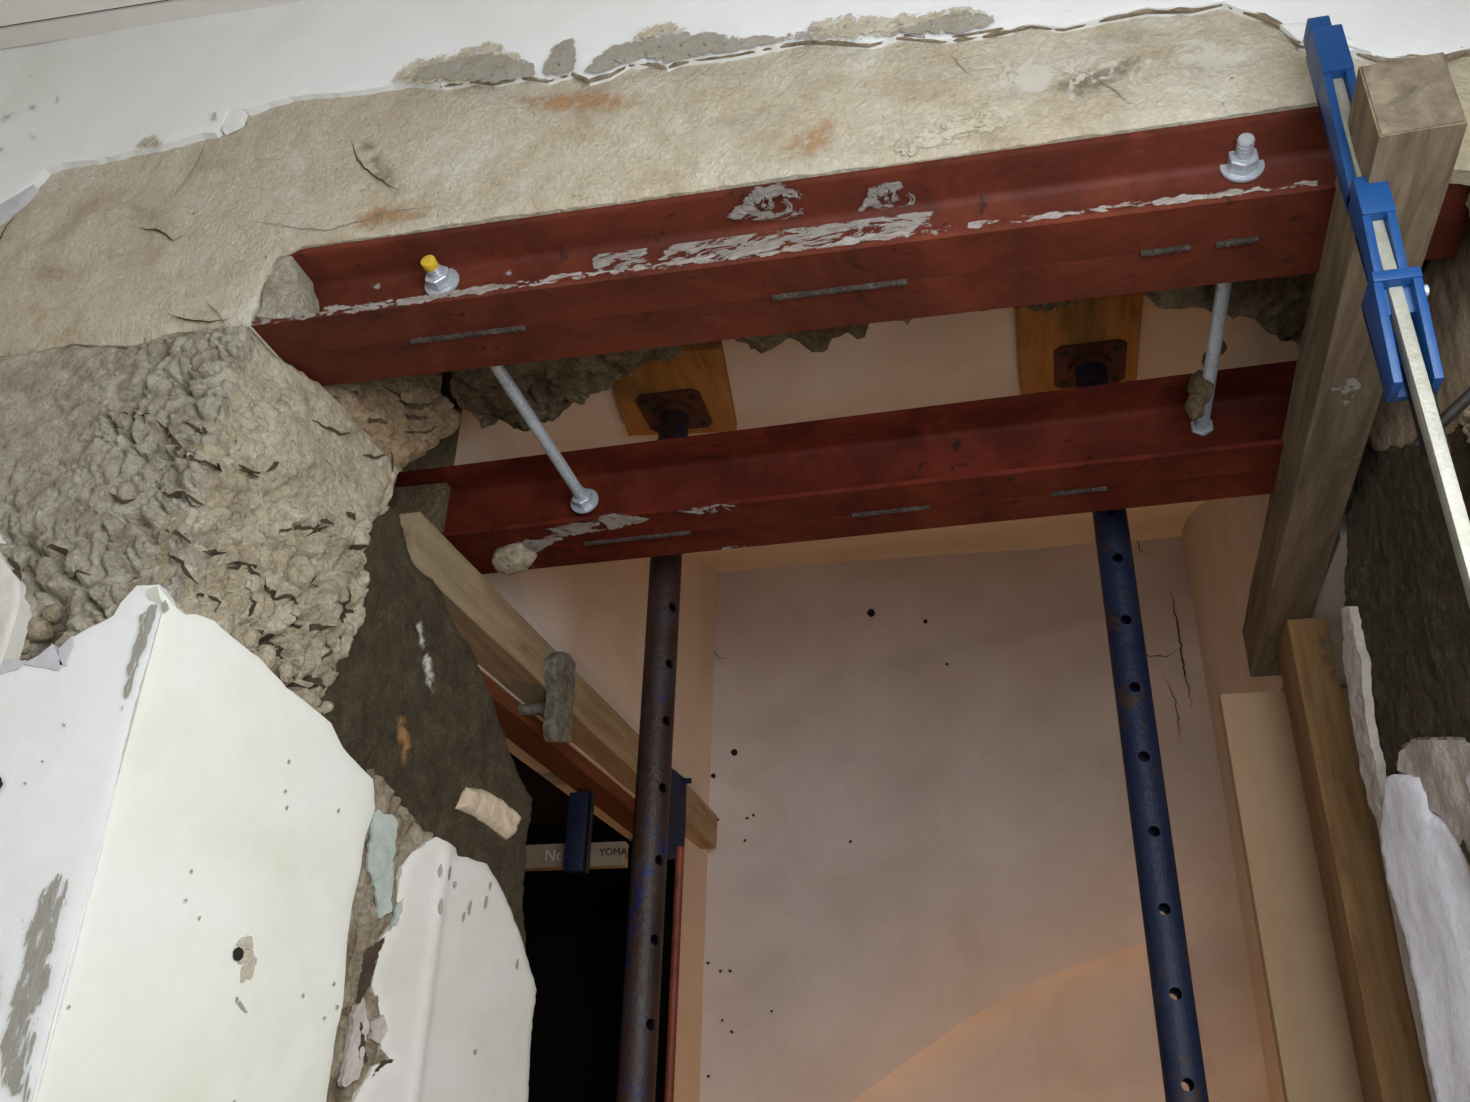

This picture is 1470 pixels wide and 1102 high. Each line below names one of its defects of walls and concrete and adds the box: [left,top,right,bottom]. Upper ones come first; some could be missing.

peeling [394,4,1306,88]
spalling [1345,36,1424,63]
spalling [1445,47,1470,63]
crack [139,143,206,241]
crack [253,140,446,231]
crack [168,300,229,327]
spalling [730,324,869,354]
spalling [1143,273,1316,344]
spalling [0,325,705,715]
crack [1147,592,1192,743]
spalling [1341,606,1387,830]
peeling [0,873,68,1102]